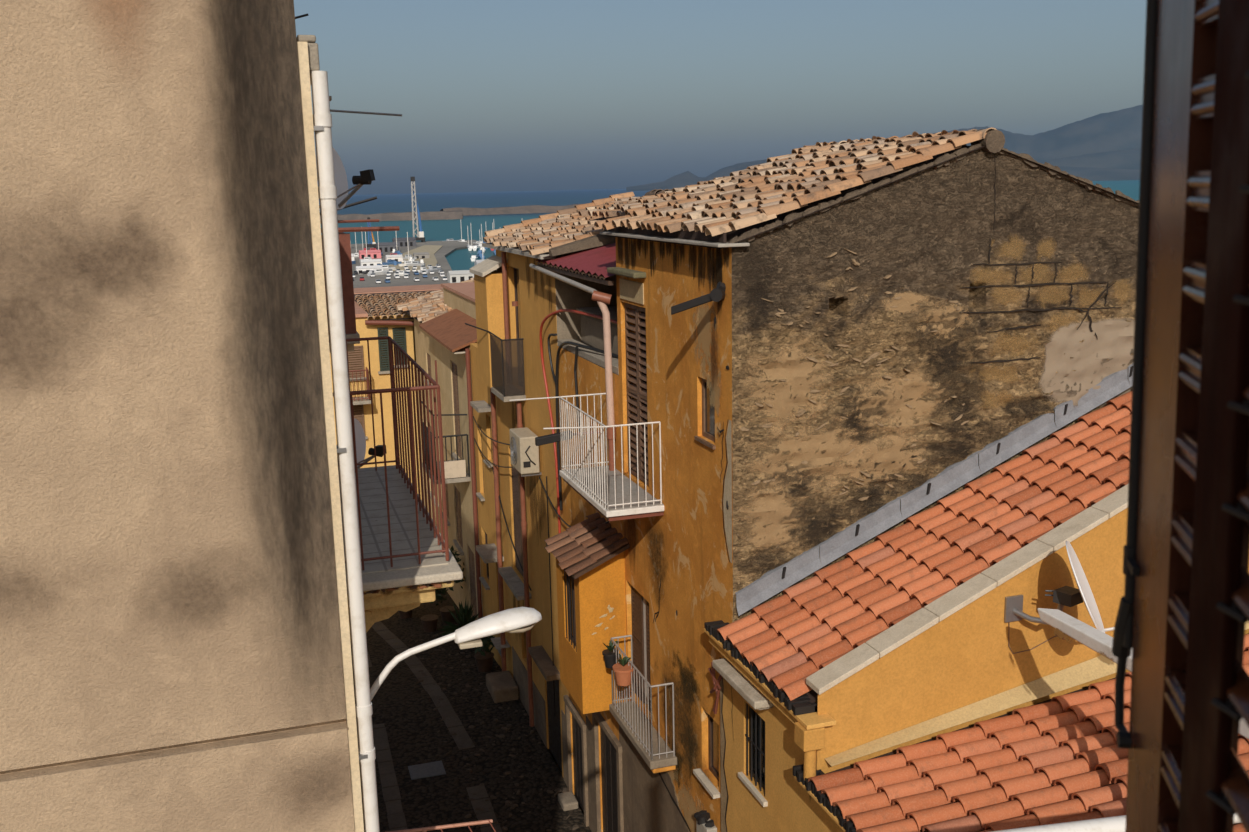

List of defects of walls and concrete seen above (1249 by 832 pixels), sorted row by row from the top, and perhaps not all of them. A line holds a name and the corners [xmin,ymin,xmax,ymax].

water stain [220,0,337,611]
water stain [618,237,774,338]
flaking render [884,238,1135,407]
flaking render [693,295,969,563]
water stain [625,518,665,583]
water stain [662,656,706,788]